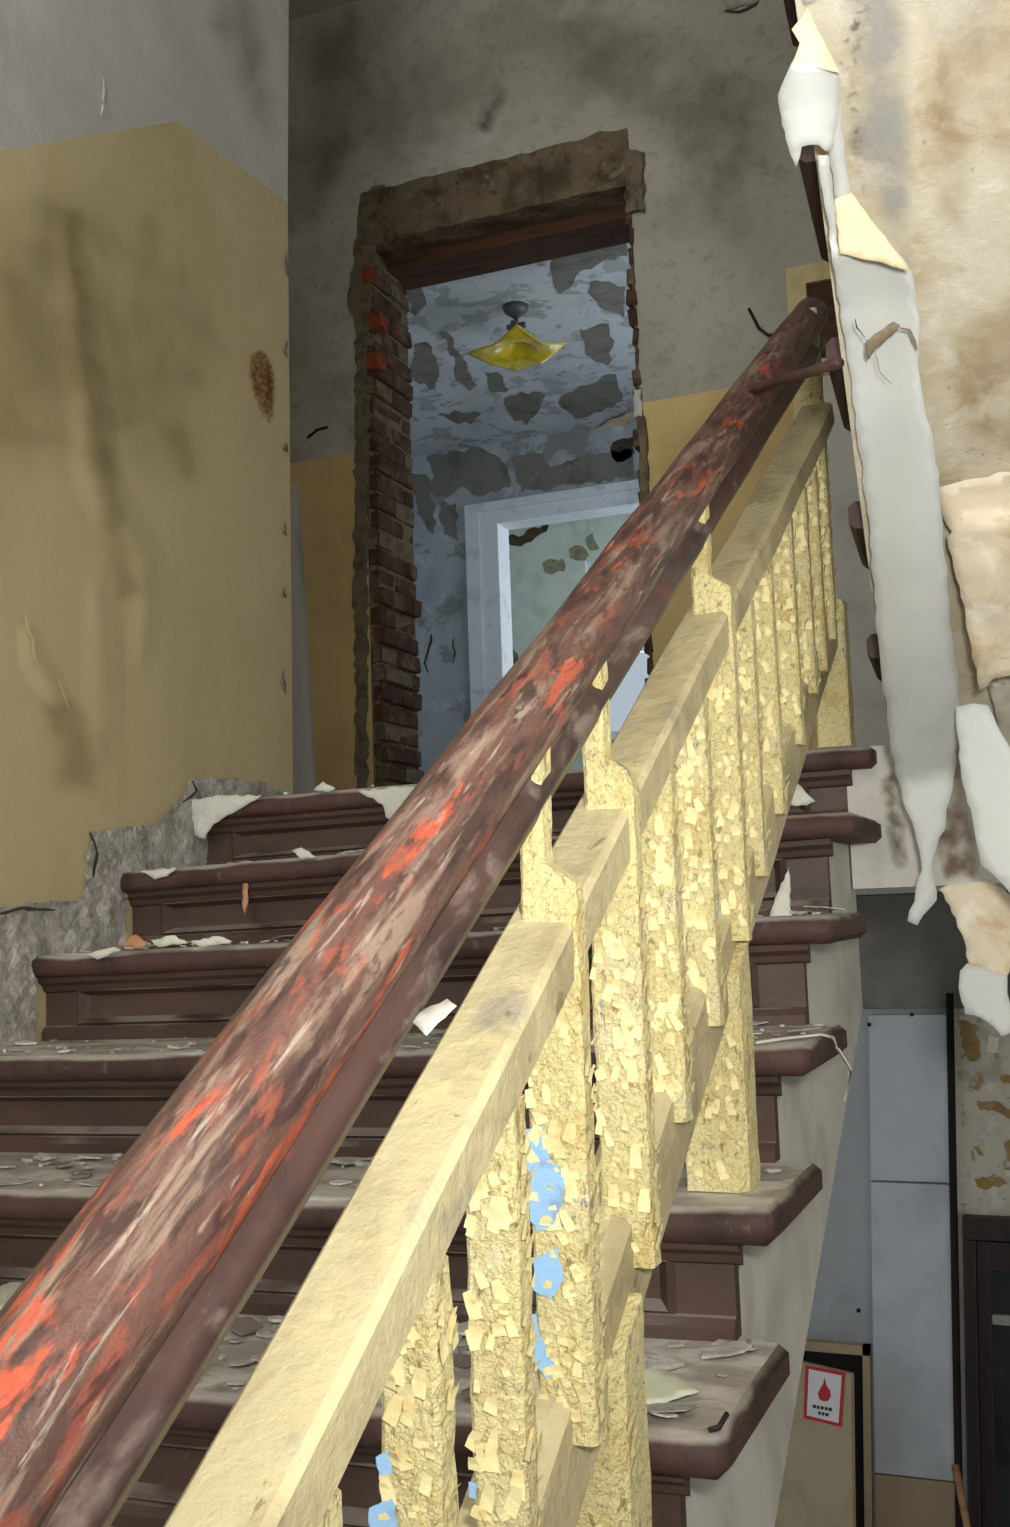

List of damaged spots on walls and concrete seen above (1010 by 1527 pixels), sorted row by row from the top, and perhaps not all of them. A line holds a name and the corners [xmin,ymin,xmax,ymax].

flaking render [624,149,647,215]
flaking render [347,184,415,819]
peeling [407,244,649,541]
peeling [778,0,1010,1119]
flaking render [0,777,284,1047]
peeling [314,782,335,792]
peeling [975,1140,1010,1190]